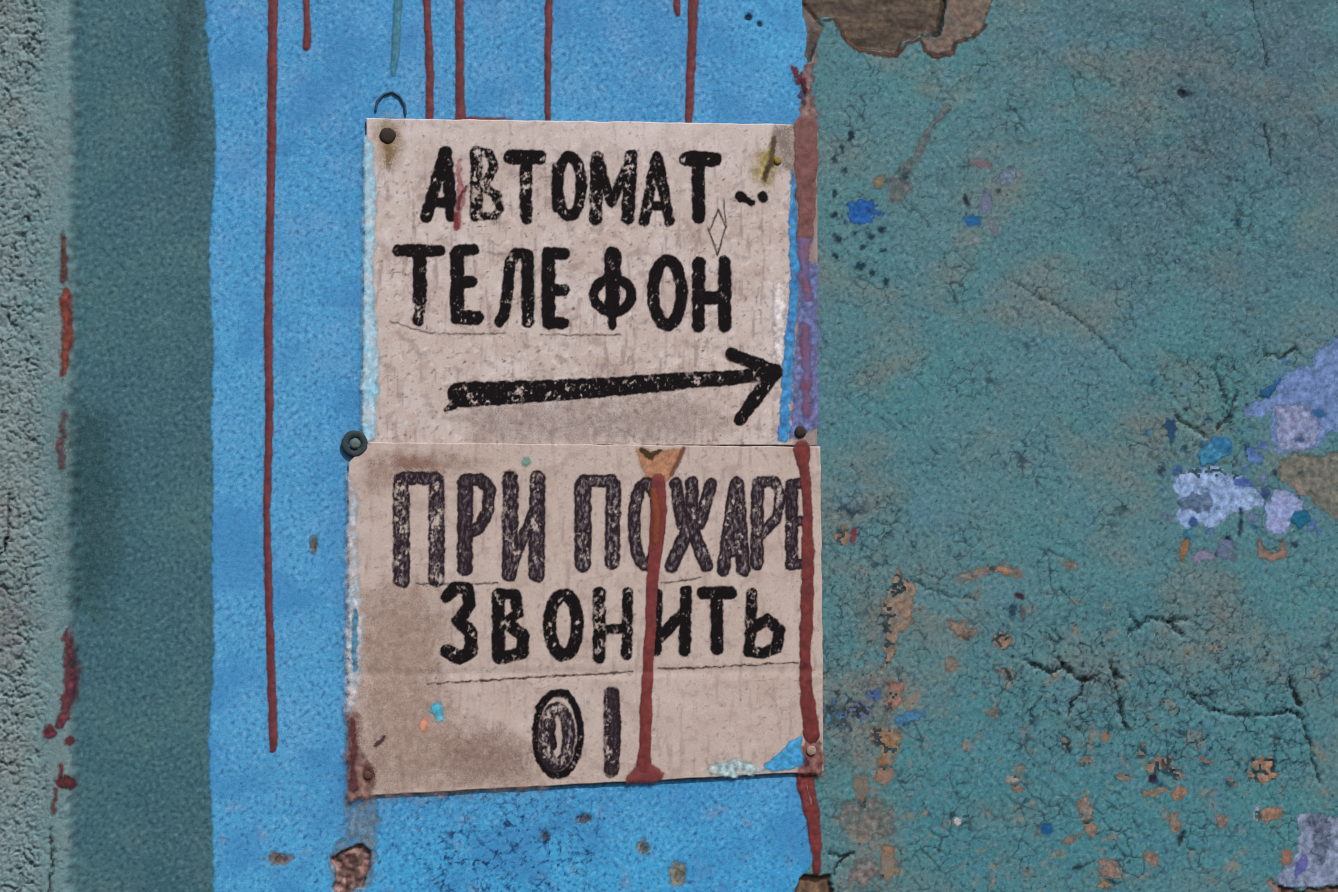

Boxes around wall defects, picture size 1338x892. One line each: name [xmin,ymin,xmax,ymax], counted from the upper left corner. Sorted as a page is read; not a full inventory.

flaking render [791,0,992,120]
peeling [1144,337,1338,563]
crack [0,493,11,554]
corrosion [44,627,81,745]
corrosion [51,763,77,814]
corrosion [798,741,825,777]
peeling [823,567,926,887]
peeling [1114,743,1188,844]
crack [1009,611,1320,782]
flaking render [328,798,380,892]
flaking render [795,875,833,892]
peeling [1253,805,1338,892]